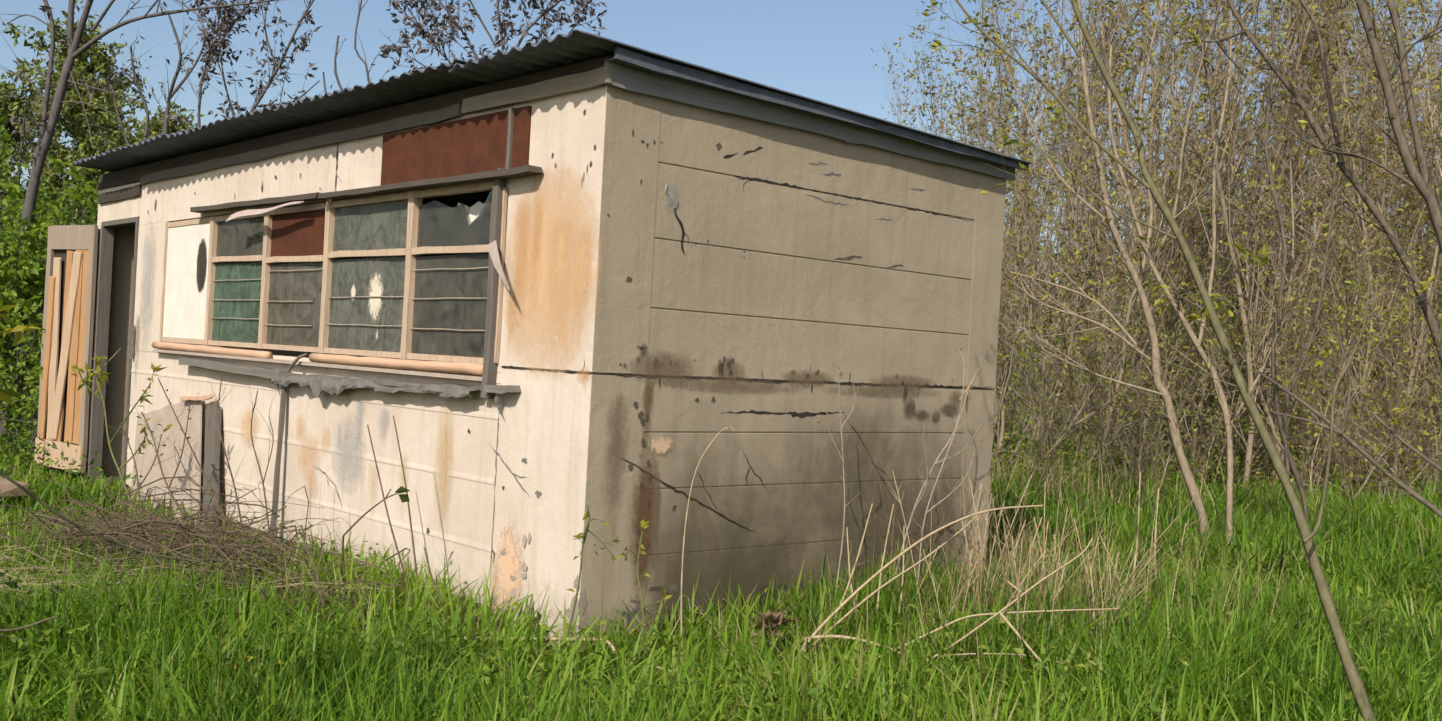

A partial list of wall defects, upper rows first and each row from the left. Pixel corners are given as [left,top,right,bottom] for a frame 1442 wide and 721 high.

crack [667,194,688,255]
crack [737,176,969,221]
water stain [788,367,825,385]
crack [488,362,991,606]